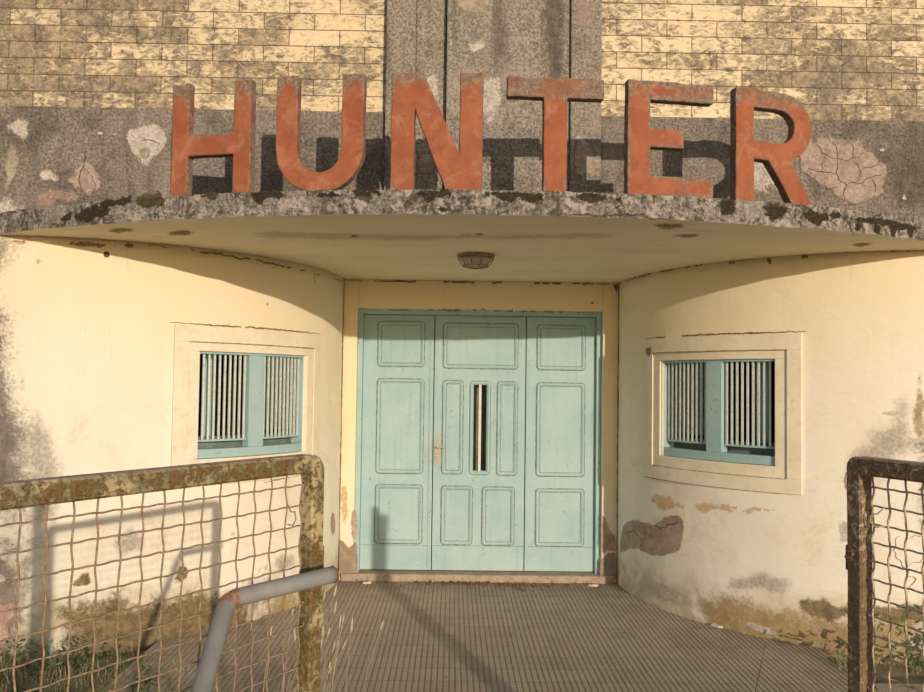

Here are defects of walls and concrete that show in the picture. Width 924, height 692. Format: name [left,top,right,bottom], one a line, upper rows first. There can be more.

spalling [40,150,102,196]
spalling [97,124,168,166]
water stain [856,217,917,237]
water stain [0,314,29,482]
water stain [914,394,924,453]
spalling [331,486,371,584]
spalling [588,495,684,587]
peeling [696,503,769,513]
water stain [0,538,31,651]